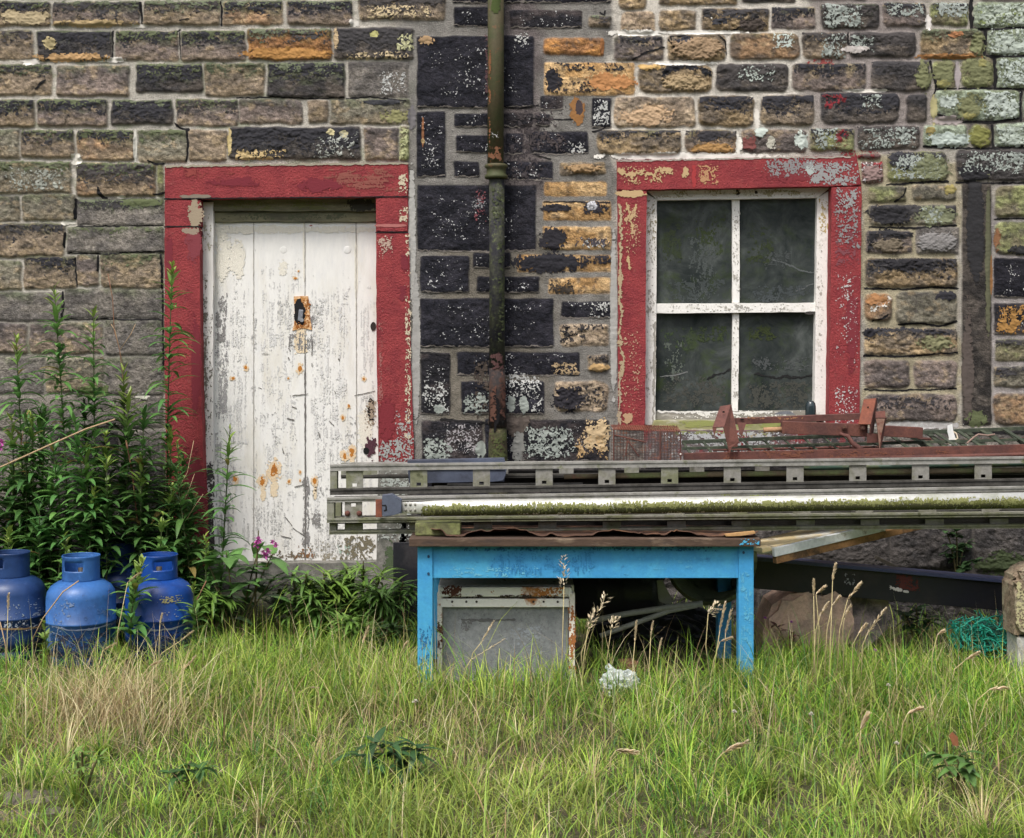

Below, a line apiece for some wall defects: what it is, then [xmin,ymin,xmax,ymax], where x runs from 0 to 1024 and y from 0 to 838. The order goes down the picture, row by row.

peeling [182,199,212,266]
peeling [191,259,383,561]
rust [256,457,318,501]
peeling [375,207,412,456]
rust [489,352,506,422]
peeling [552,143,860,460]